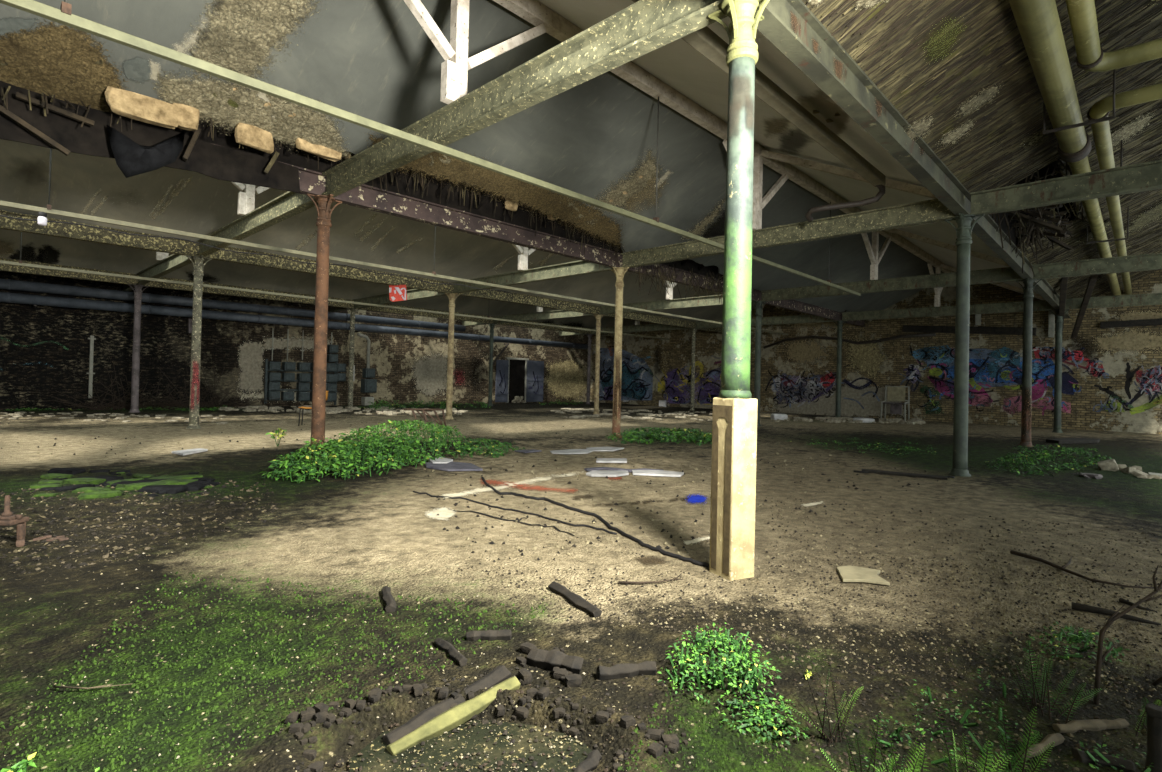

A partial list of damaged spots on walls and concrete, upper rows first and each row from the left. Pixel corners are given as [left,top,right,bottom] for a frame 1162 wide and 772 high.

flaking render [395,145,670,252]